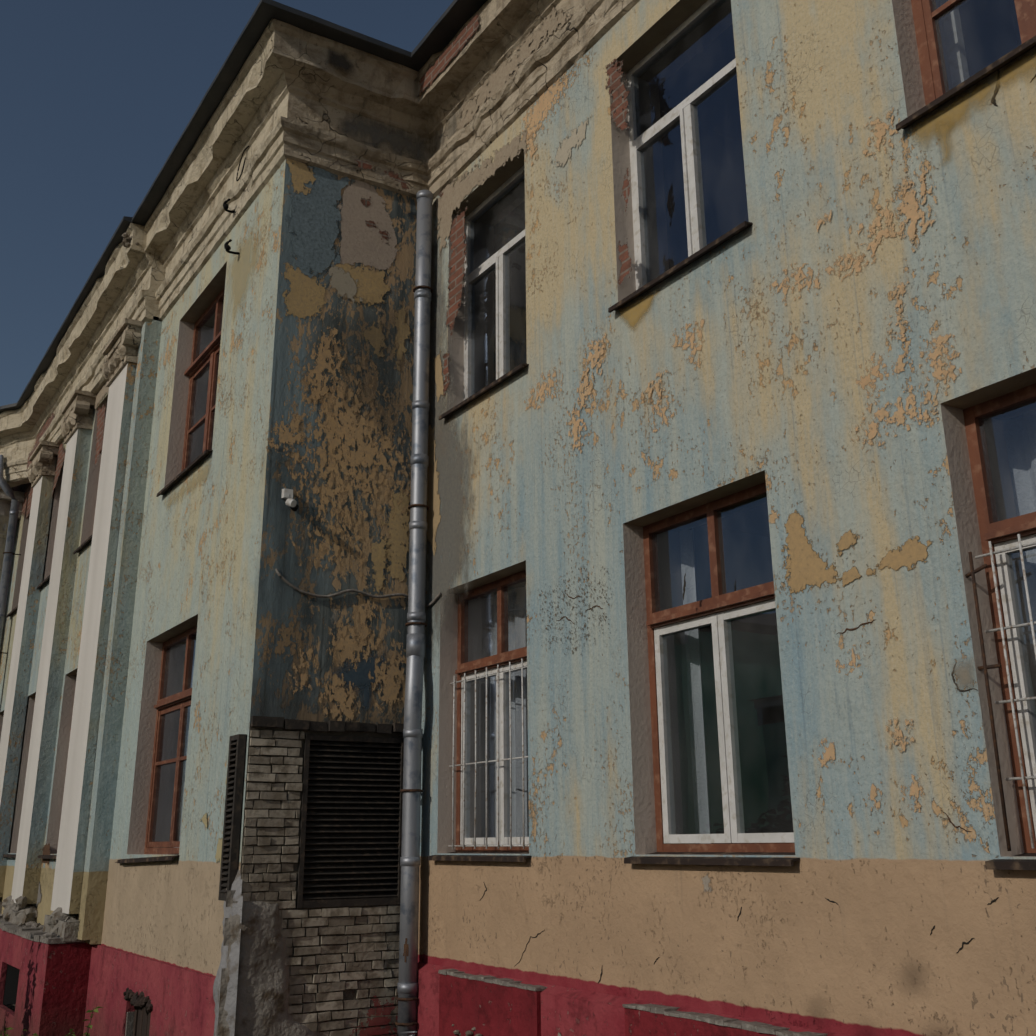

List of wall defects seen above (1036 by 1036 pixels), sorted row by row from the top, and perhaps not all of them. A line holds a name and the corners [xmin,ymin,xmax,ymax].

spalling [605,58,630,137]
peeling [286,158,316,200]
spalling [281,180,398,321]
spalling [434,71,592,336]
spalling [617,238,632,285]
spalling [621,168,630,212]
peeling [769,156,937,306]
peeling [524,328,609,456]
peeling [851,276,962,451]
peeling [258,306,411,721]
peeling [781,509,933,594]